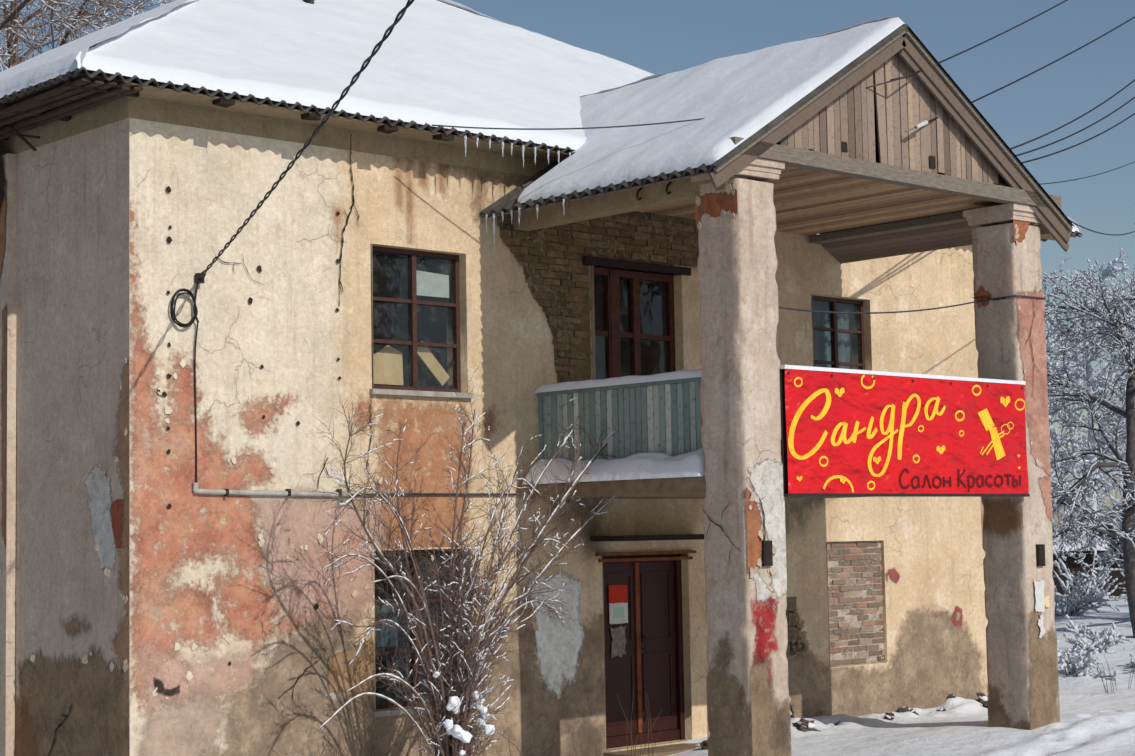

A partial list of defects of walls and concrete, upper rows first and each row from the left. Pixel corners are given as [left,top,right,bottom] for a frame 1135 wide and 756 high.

crack [339,134,359,306]
flaking render [497,184,738,383]
flaking render [1013,219,1040,245]
peeling [17,242,471,756]
peeling [484,410,494,436]
peeling [746,458,809,656]
peeling [1016,286,1053,522]
damp [706,609,1060,756]